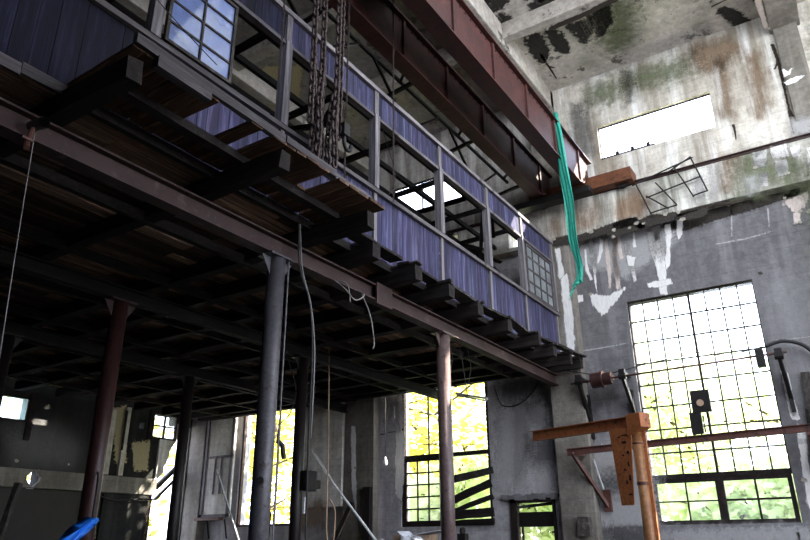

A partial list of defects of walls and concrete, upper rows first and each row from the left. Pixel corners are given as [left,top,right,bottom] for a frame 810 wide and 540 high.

peeling [782,68,803,85]
peeling [793,120,810,133]
peeling [578,286,625,316]